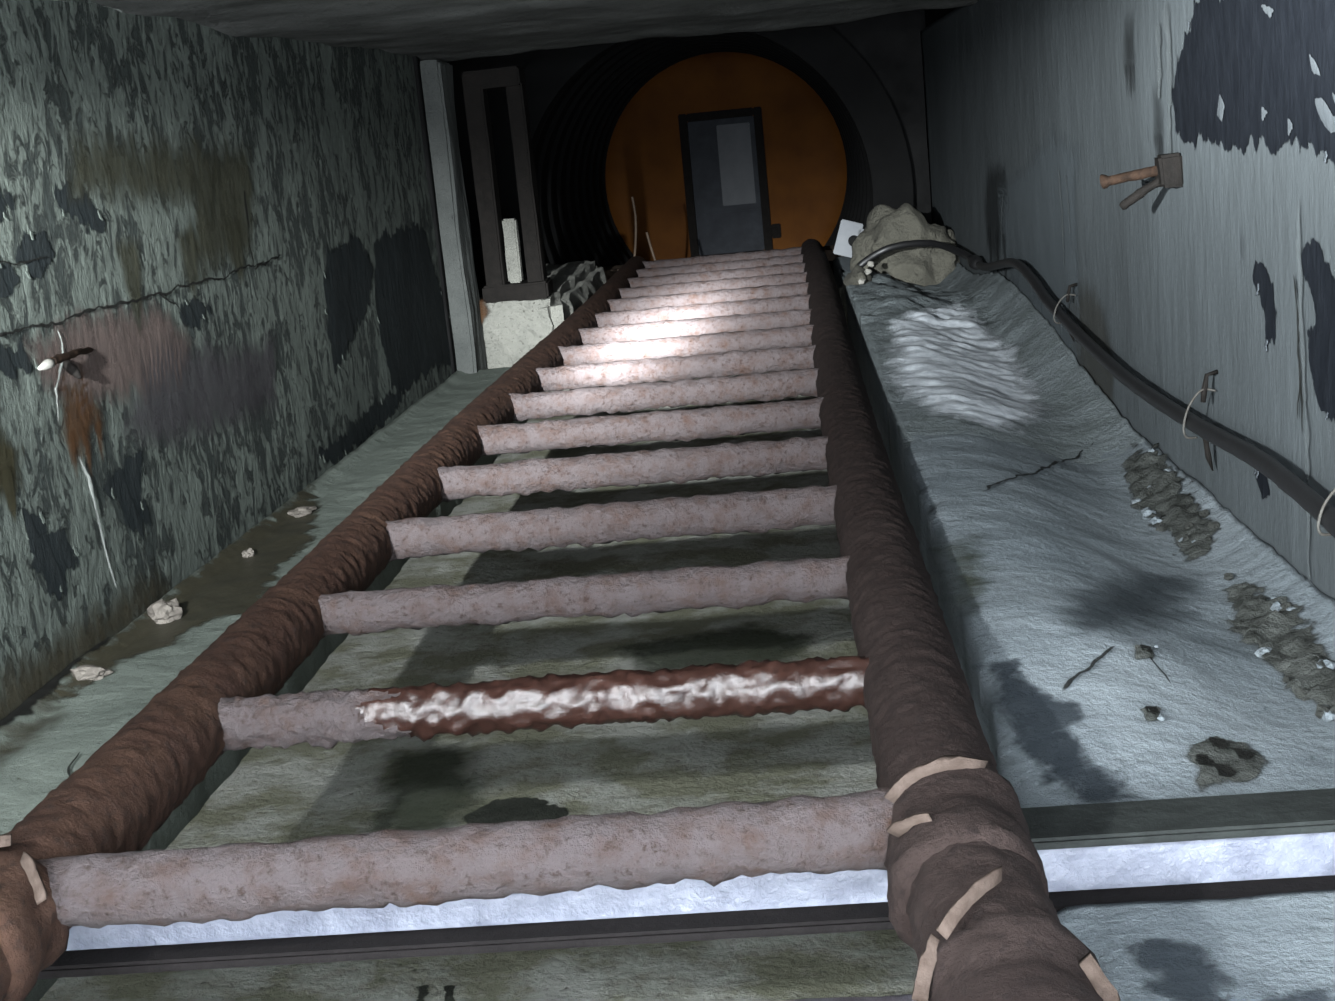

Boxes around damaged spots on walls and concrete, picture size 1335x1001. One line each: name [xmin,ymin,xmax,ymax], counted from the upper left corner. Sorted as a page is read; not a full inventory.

peeling [1171,0,1335,165]
crack [0,192,281,337]
peeling [1253,261,1276,352]
peeling [1301,238,1335,422]
spalling [1122,443,1221,562]
spalling [1219,573,1335,722]
spalling [1187,736,1269,792]